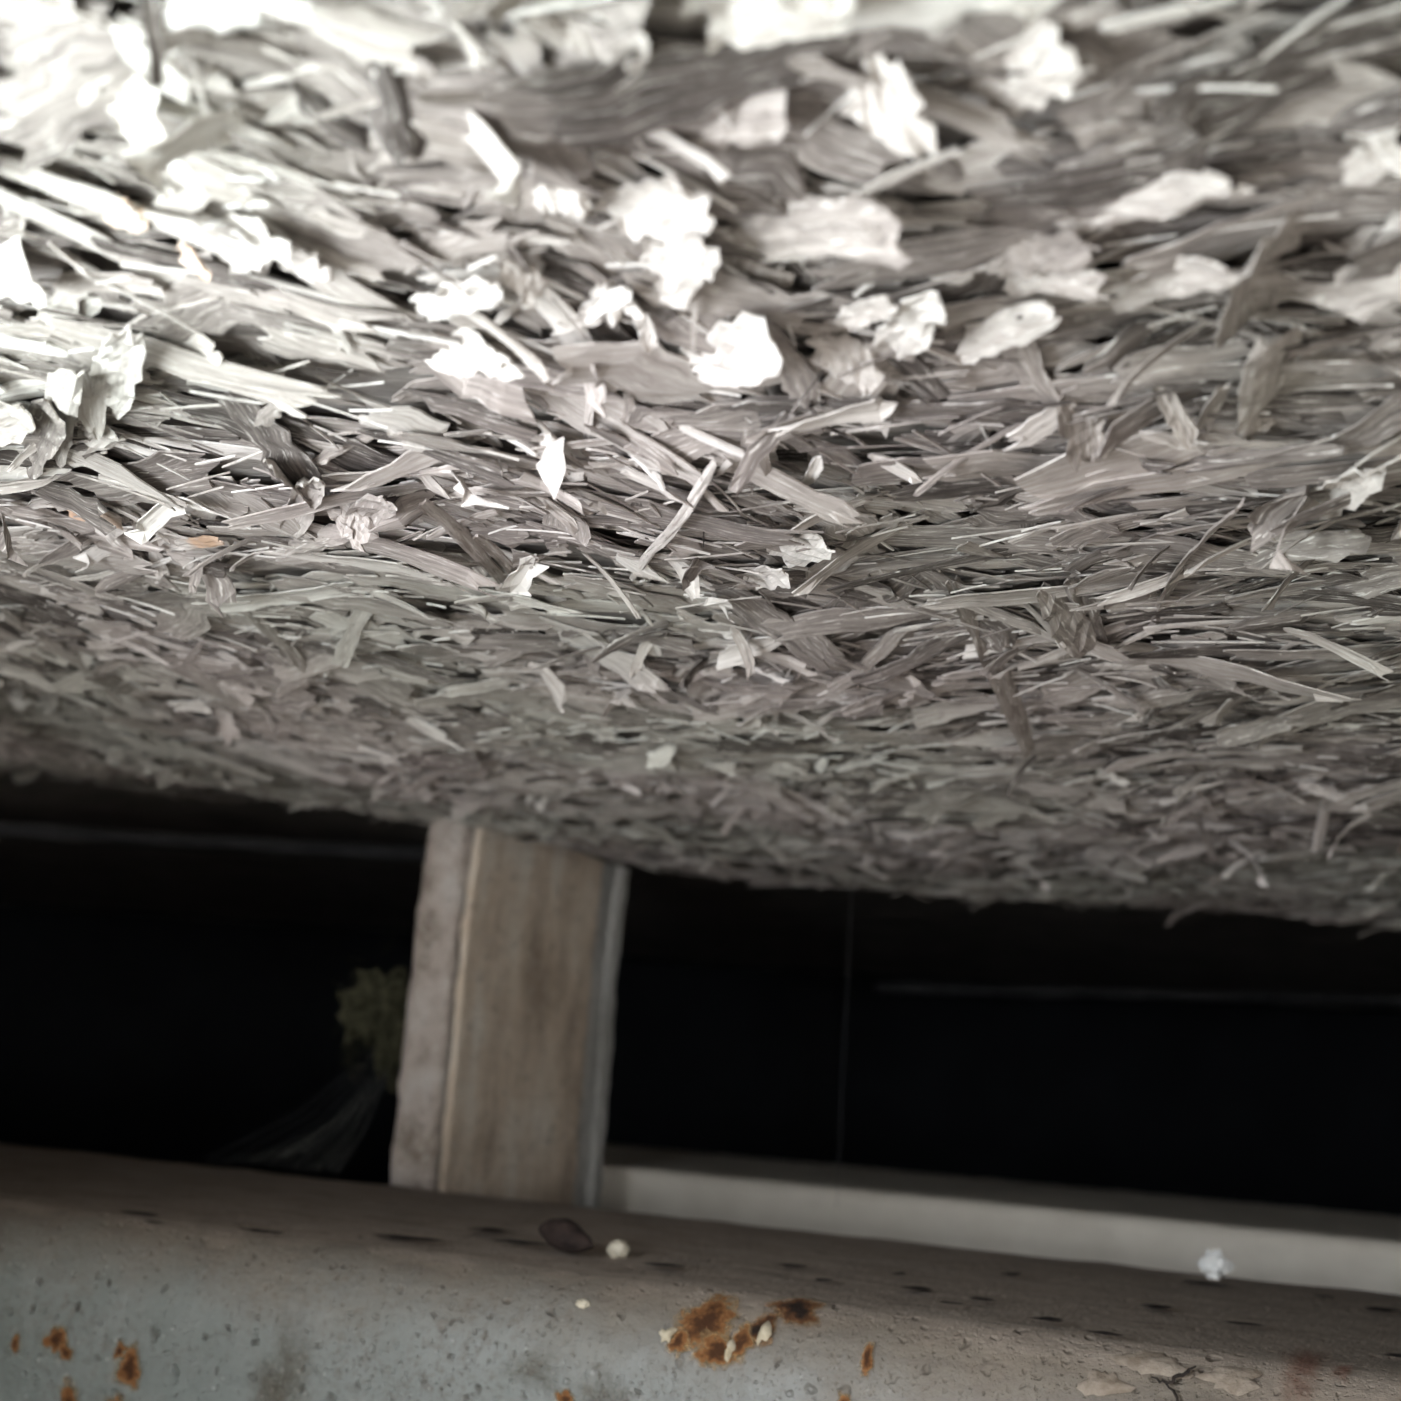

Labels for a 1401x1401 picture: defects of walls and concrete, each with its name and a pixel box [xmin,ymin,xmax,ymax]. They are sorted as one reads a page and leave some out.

rust [42,1327,73,1360]
rust [60,1377,78,1401]
rust [106,1339,140,1401]
rust [667,1293,823,1370]